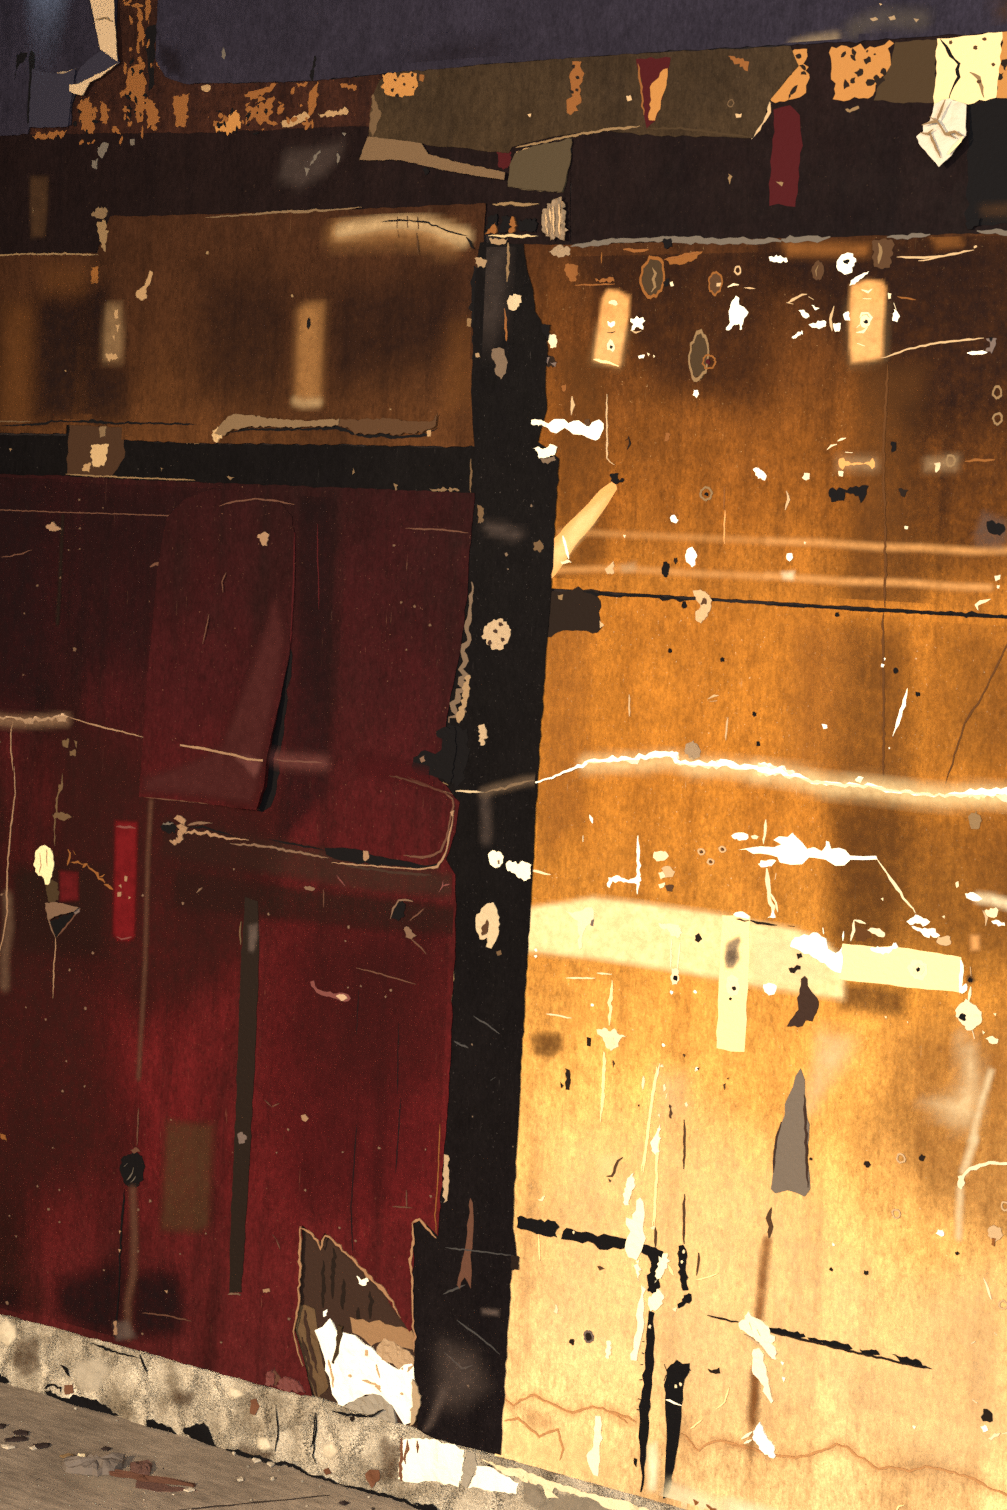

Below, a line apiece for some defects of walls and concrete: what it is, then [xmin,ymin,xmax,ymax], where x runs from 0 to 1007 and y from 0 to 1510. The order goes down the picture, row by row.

corrosion [30,0,397,145]
peeling [771,49,810,103]
peeling [829,39,967,167]
crack [389,364,1007,801]
crack [0,715,142,950]
flaking render [731,833,878,867]
crack [50,938,58,990]